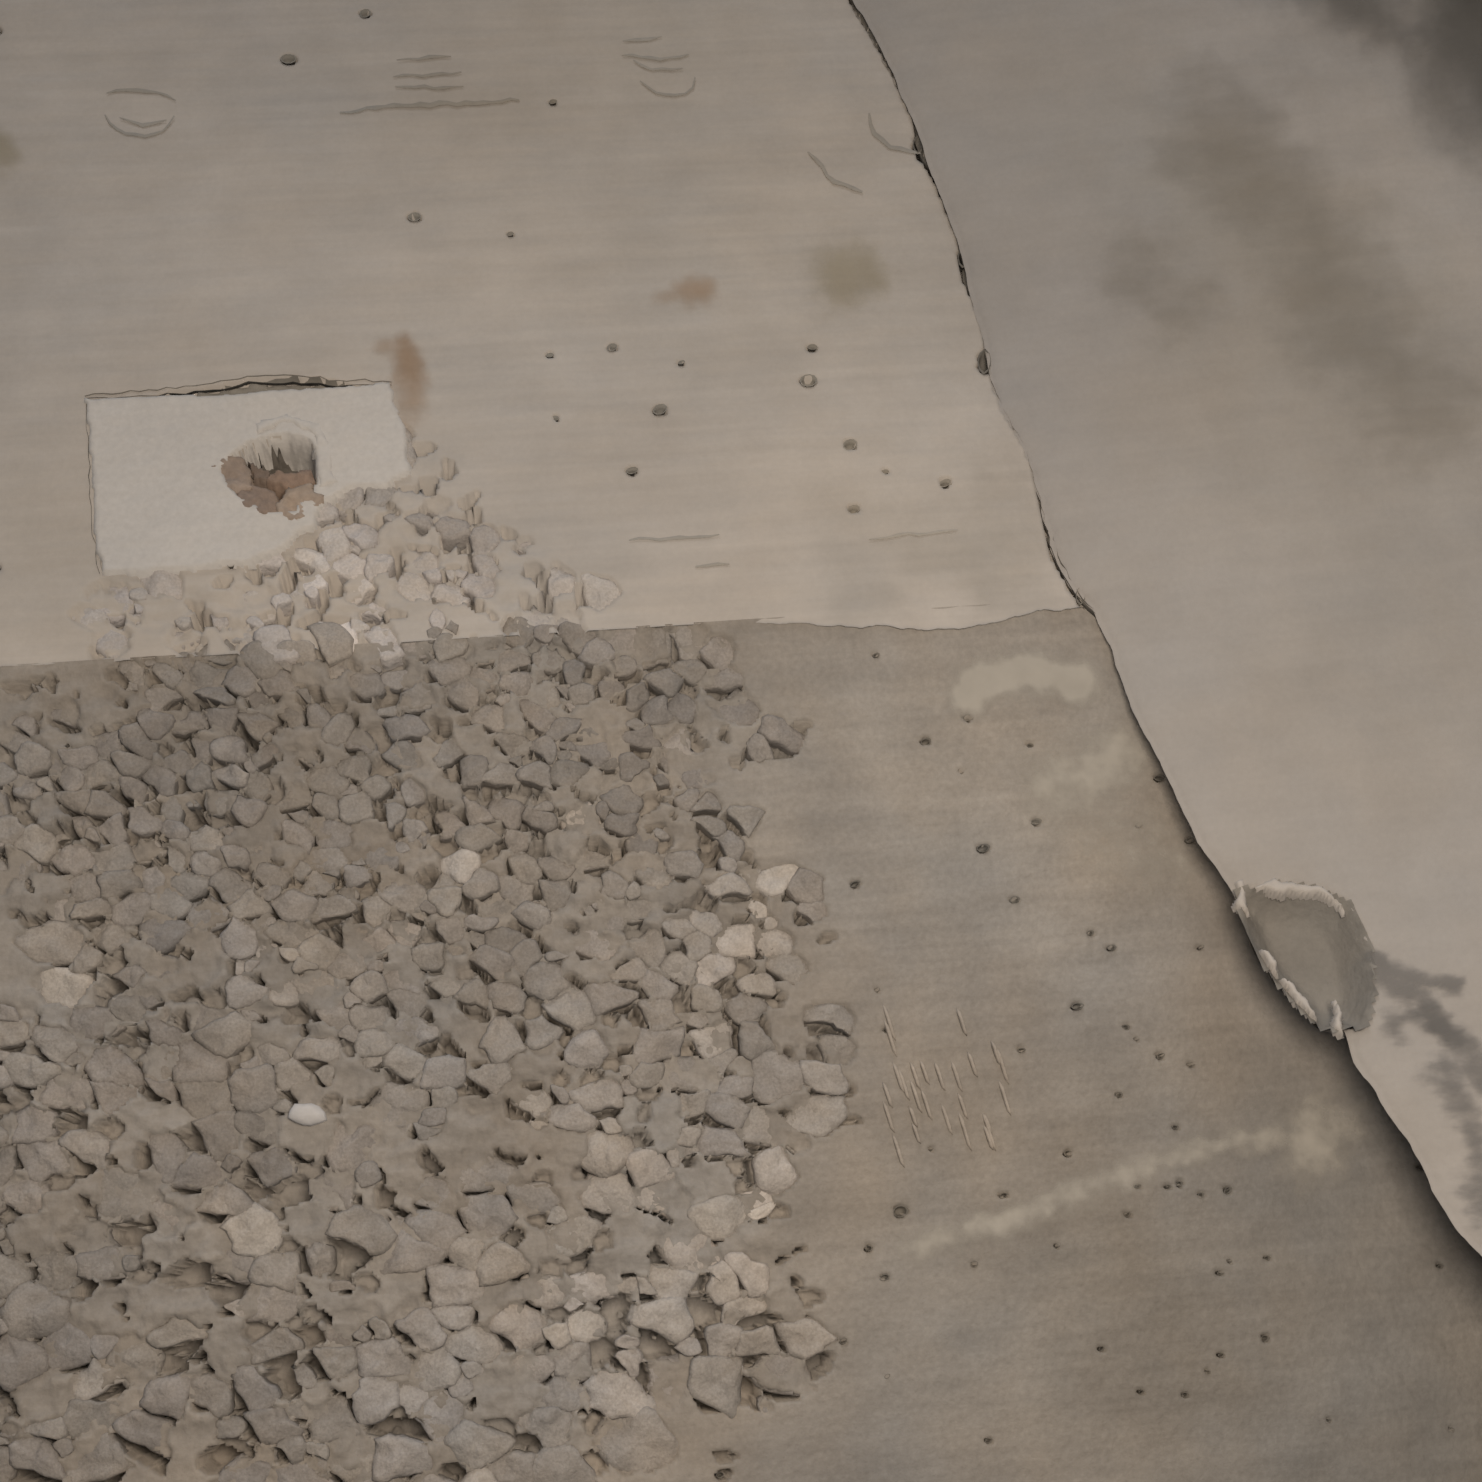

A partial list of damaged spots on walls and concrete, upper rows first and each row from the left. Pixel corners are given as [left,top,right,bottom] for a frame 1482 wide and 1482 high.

leakage [1434,0,1482,99]
flaking render [246,487,502,671]
flaking render [14,920,89,967]
flaking render [541,984,596,1031]
spalling [1231,878,1379,1040]
flaking render [12,1025,146,1182]
flaking render [147,1039,327,1258]
flaking render [546,1078,746,1420]
flaking render [0,1251,124,1415]
flaking render [146,1317,209,1349]
flaking render [772,1317,838,1361]
flaking render [7,1372,304,1482]